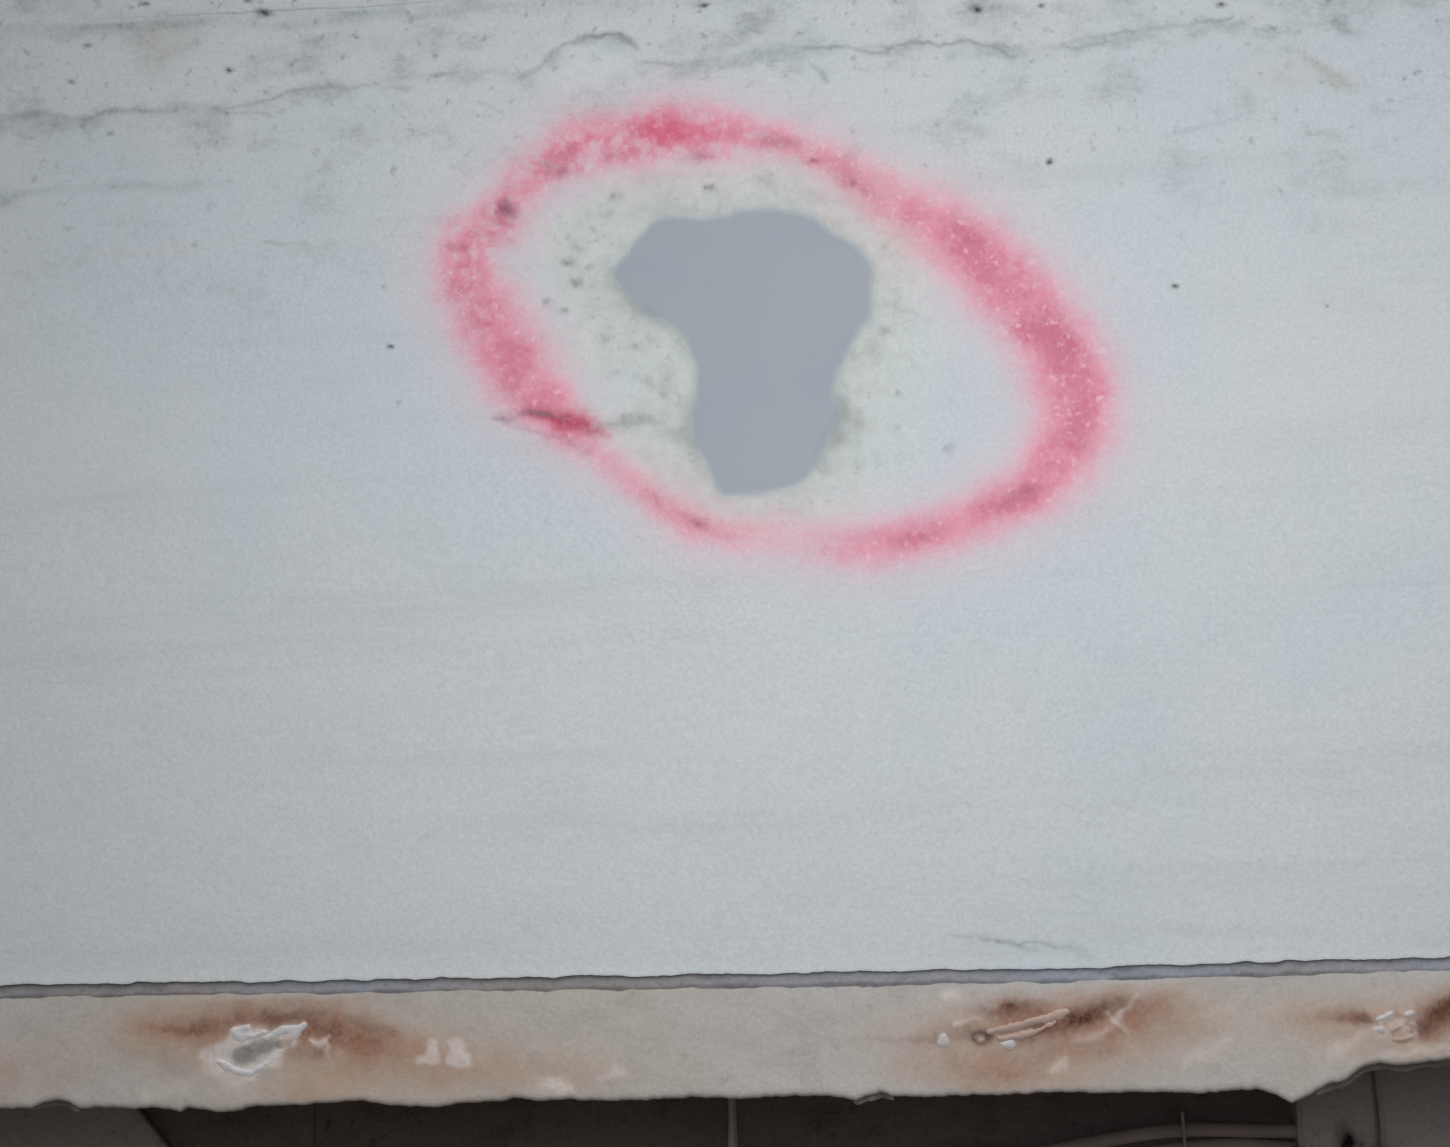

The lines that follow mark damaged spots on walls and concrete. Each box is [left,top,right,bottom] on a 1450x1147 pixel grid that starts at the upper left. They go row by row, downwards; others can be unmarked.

spalling [565,173,909,526]
spalling [200,1020,314,1080]
rust [1003,1003,1136,1038]
rust [1417,999,1450,1036]